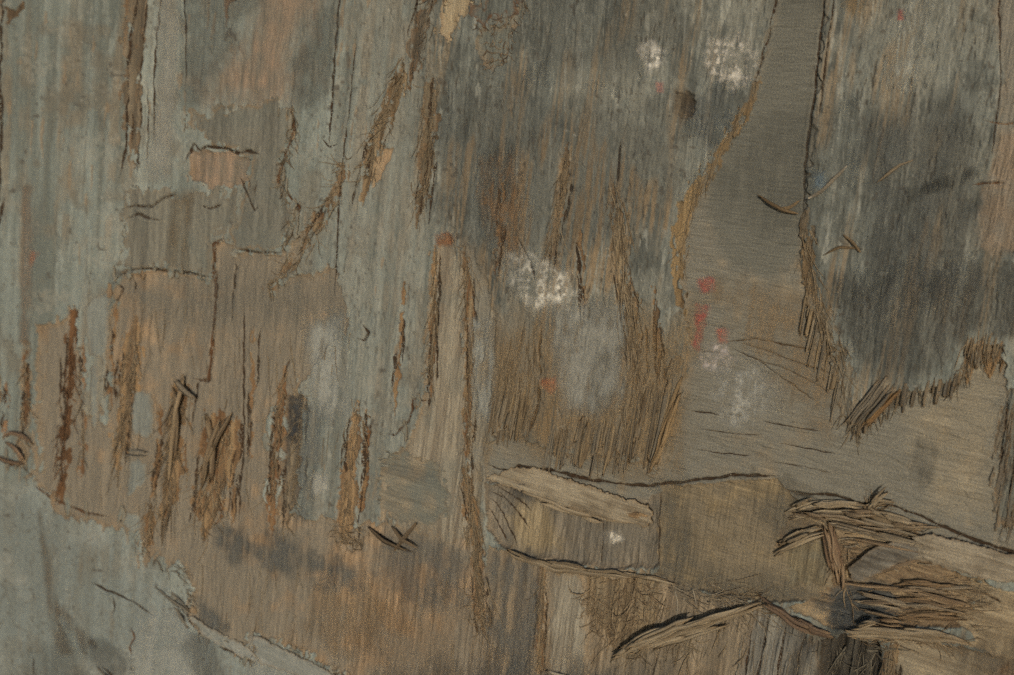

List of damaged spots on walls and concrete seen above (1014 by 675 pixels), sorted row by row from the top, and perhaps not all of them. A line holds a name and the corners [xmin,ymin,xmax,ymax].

crack [0,0,8,221]
spalling [675,92,697,119]
crack [106,0,391,528]
crack [496,156,585,310]
crack [0,331,145,557]
crack [341,256,1014,572]
spalling [820,633,897,675]
spalling [823,585,901,630]
peeling [895,577,1014,675]